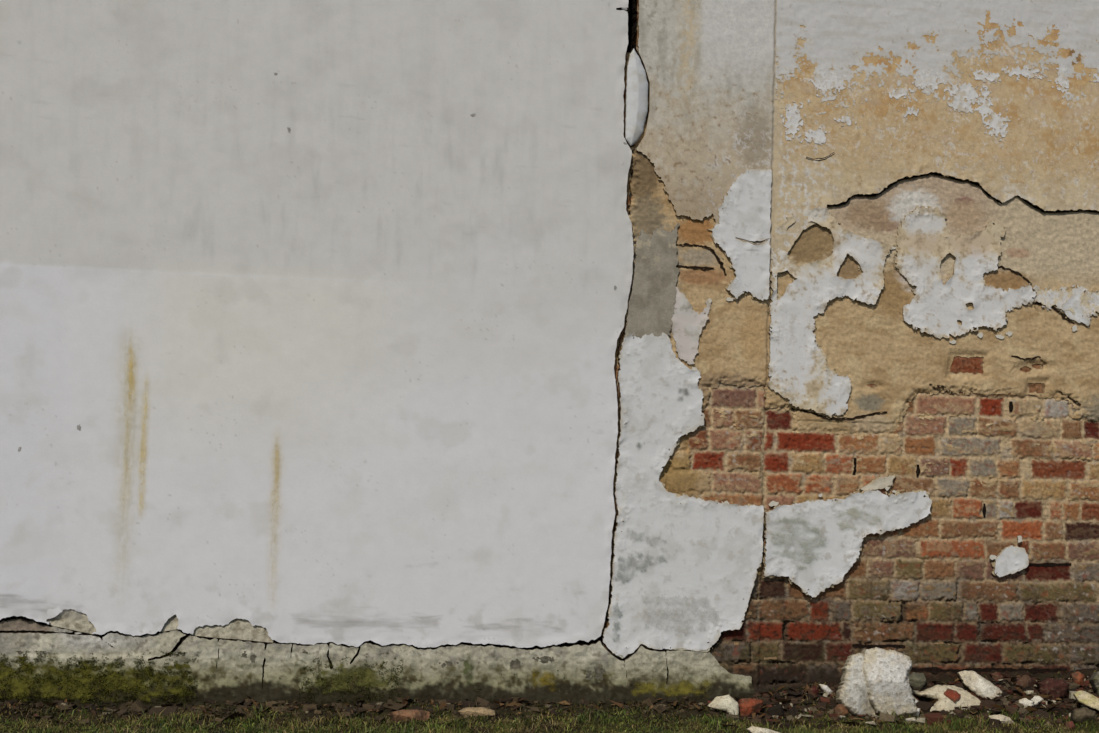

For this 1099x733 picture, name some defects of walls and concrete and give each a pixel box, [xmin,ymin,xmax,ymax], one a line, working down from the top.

crack [616,0,649,122]
peeling [778,11,1099,186]
crack [628,145,638,239]
crack [827,172,1099,213]
flaking render [707,168,1099,418]
crack [0,288,675,688]
flaking render [602,286,932,658]
flaking render [989,536,1029,577]
spalling [47,609,96,634]
spalling [160,614,179,632]
spalling [191,618,273,663]